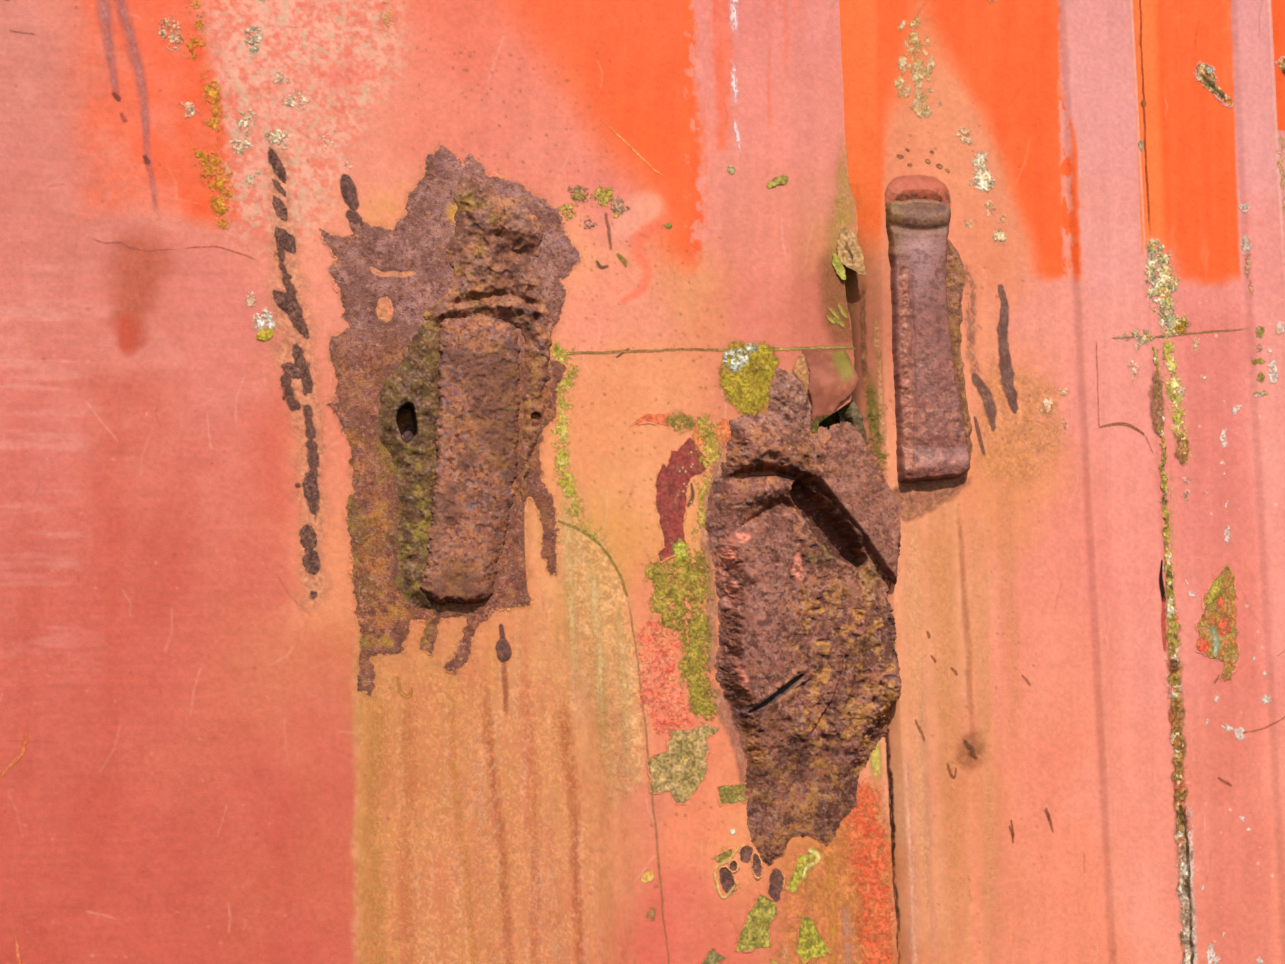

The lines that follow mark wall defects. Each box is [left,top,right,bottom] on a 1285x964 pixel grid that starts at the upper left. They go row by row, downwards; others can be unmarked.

corrosion [965,270,1018,455]
corrosion [319,145,581,703]
peeling [633,413,670,426]
peeling [655,419,731,563]
corrosion [701,445,724,666]
peeling [1186,564,1266,702]
peeling [646,724,719,805]
corrosion [710,686,746,799]
peeling [718,782,748,806]
peeling [1205,720,1244,740]
peeling [1206,932,1225,964]